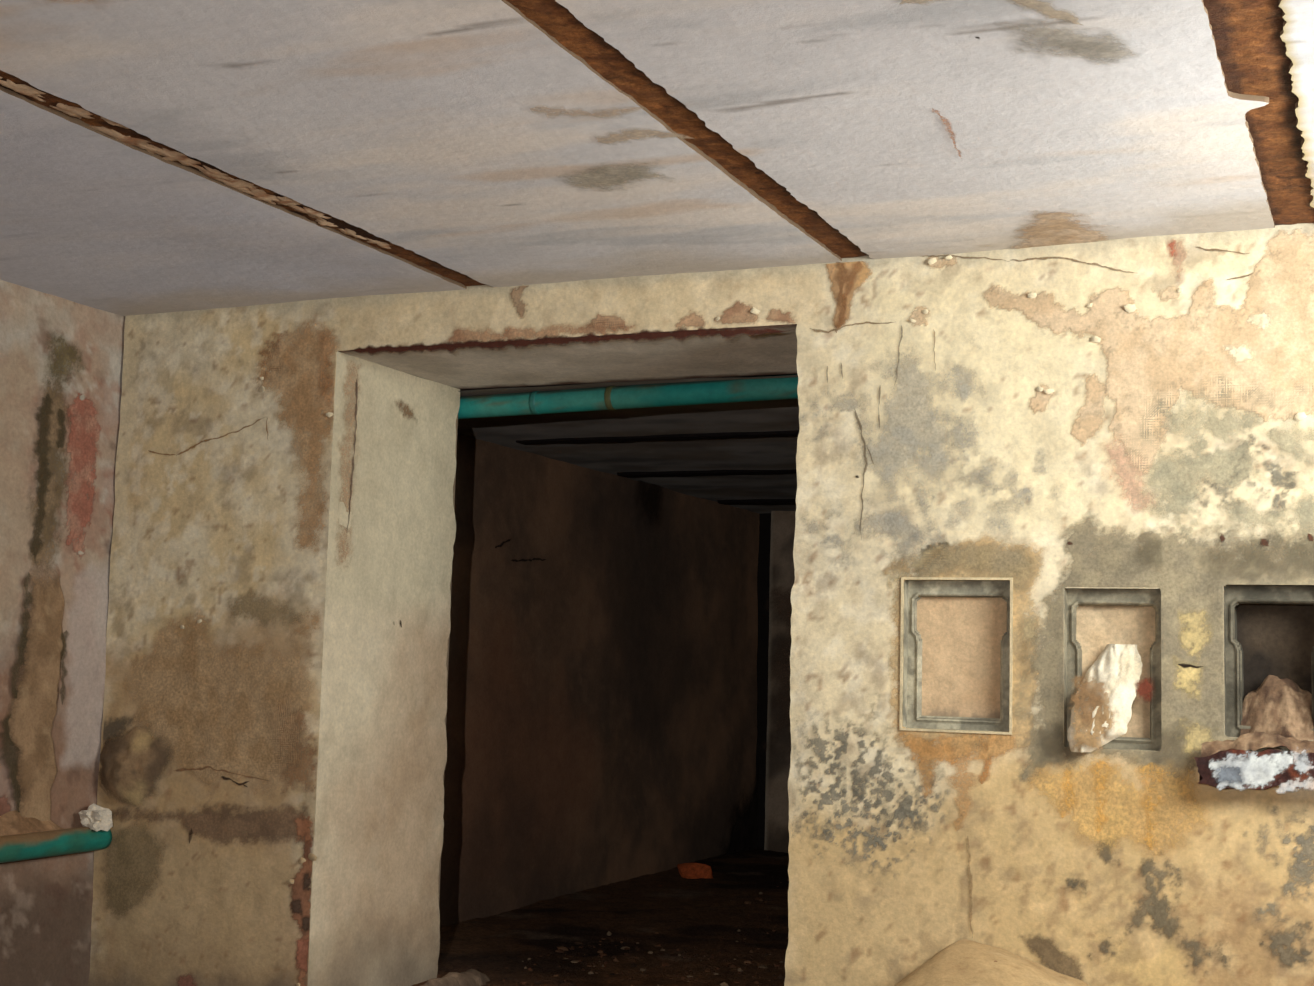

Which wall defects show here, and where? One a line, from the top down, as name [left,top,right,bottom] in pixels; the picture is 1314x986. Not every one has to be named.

corrosion [0,70,486,286]
peeling [259,323,337,547]
corrosion [506,0,872,333]
crack [810,322,903,538]
crack [923,255,1134,273]
flaking render [985,229,1314,474]
crack [1197,247,1253,280]
corrosion [1203,0,1314,225]
water stain [790,725,948,866]
flaking render [288,837,317,986]
water stain [1027,936,1115,980]
water stain [1129,852,1227,967]